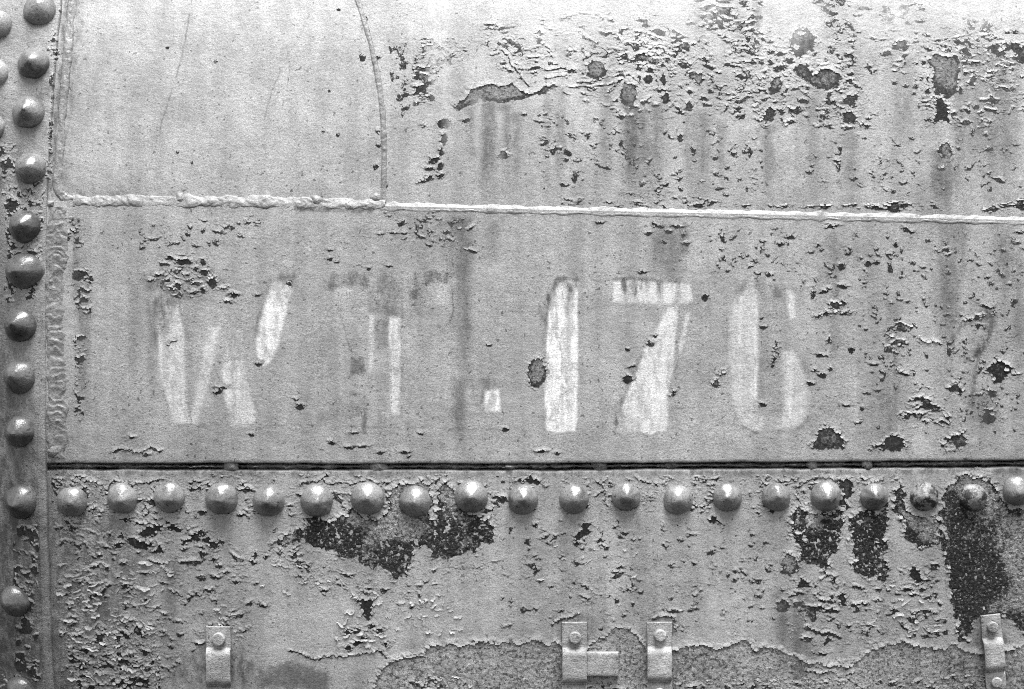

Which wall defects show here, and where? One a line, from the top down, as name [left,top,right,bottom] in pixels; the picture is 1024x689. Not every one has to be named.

peeling [139,214,263,304]
peeling [324,247,342,263]
peeling [359,0,1024,455]
peeling [50,467,1024,689]